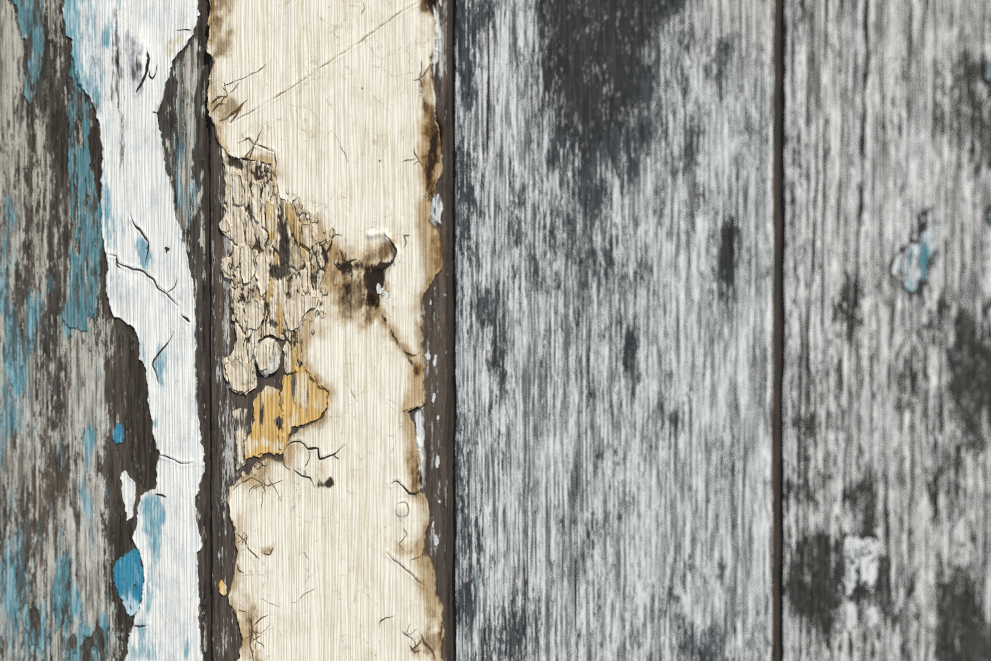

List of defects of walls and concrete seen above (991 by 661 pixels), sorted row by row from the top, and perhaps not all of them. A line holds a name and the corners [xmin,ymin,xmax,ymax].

peeling [13,0,44,104]
crack [212,2,418,172]
peeling [523,0,678,164]
crack [110,215,190,380]
peeling [51,0,445,661]
crack [318,234,357,271]
water stain [336,242,397,342]
crack [381,234,410,270]
peeling [892,212,937,291]
crack [236,441,343,507]
peeling [789,468,879,641]
peeling [25,605,40,645]